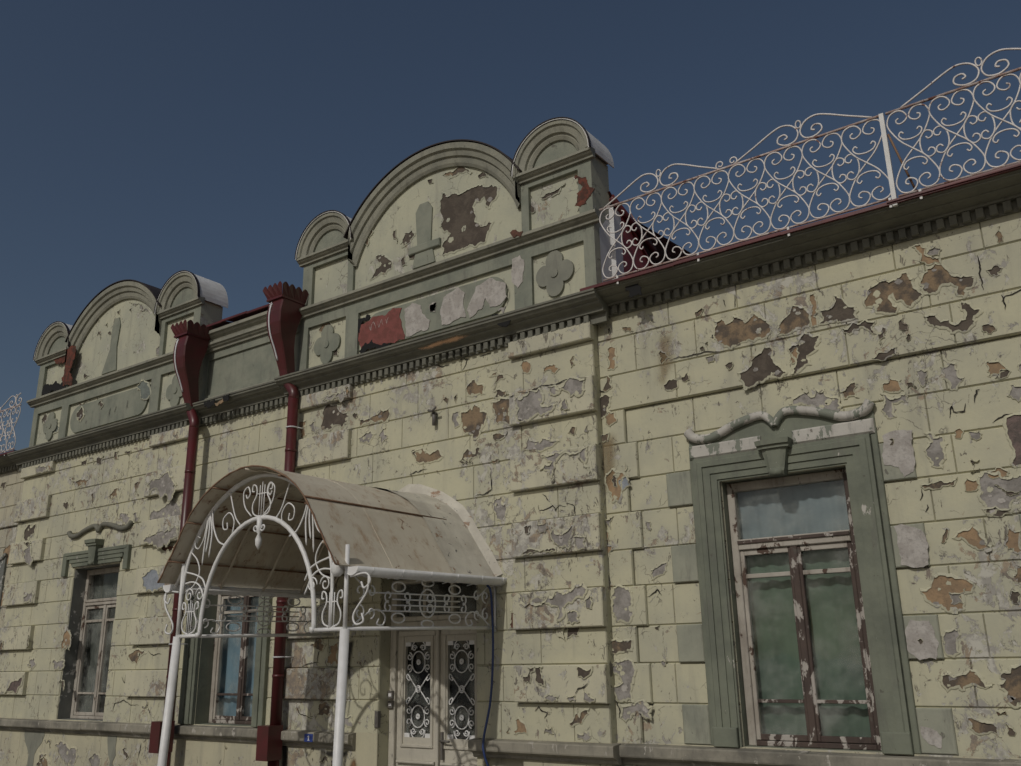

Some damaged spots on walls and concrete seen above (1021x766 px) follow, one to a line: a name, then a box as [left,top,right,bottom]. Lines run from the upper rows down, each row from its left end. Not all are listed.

flaking render [428,167,500,256]
flaking render [358,255,525,353]
flaking render [658,243,1003,411]
peeling [443,356,590,483]
peeling [600,326,633,443]
flaking render [880,360,1021,518]
peeling [522,522,586,556]
peeling [648,562,668,597]
flaking render [893,524,976,614]
peeling [941,525,1021,605]
peeling [905,619,961,660]
flaking render [939,661,1021,737]